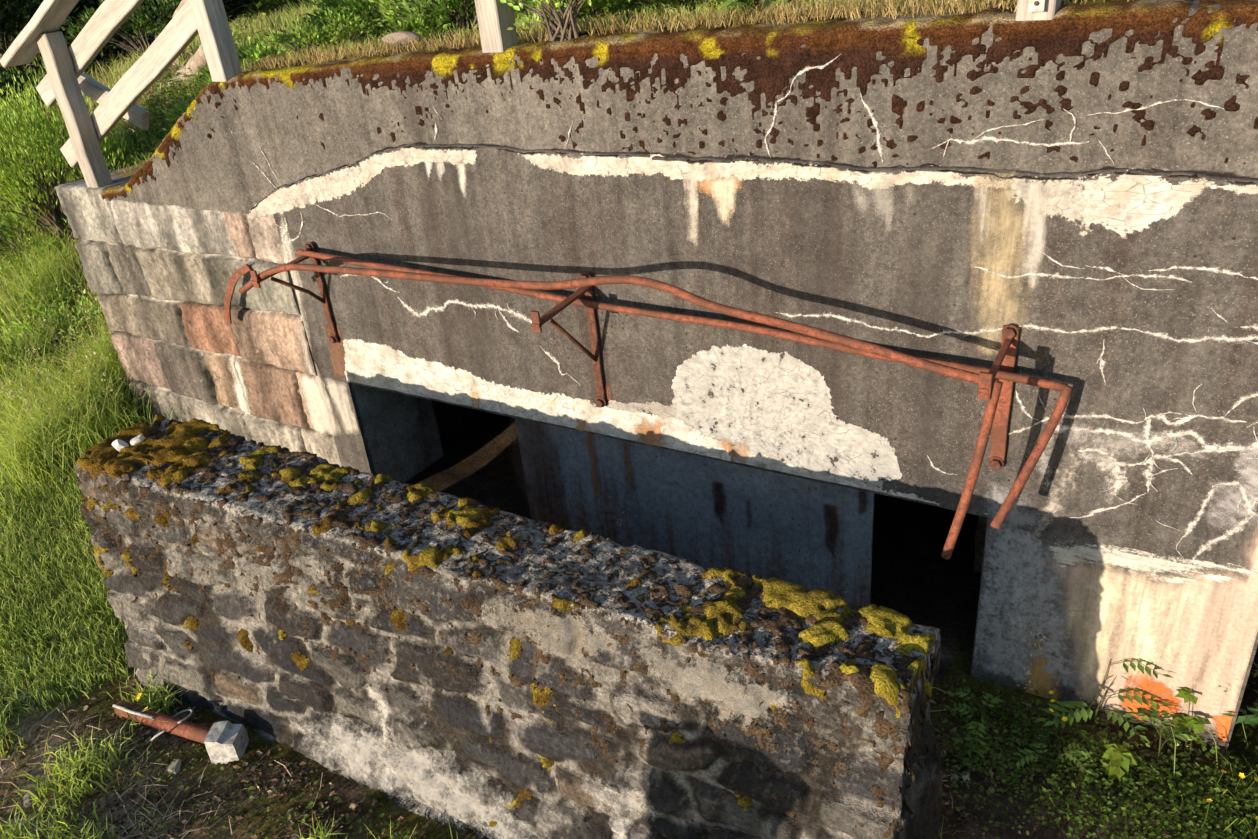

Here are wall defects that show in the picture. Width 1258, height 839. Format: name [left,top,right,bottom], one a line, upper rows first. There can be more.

spalling [247,147,477,220]
damp [426,162,465,193]
crack [219,54,1258,263]
spalling [518,152,1258,238]
crack [976,249,1258,290]
crack [776,308,1258,384]
peeling [343,338,940,505]
rust [624,422,662,491]
crack [1008,384,1258,561]
damp [973,431,1258,727]
rust [1121,669,1181,721]
rust [1213,712,1234,742]